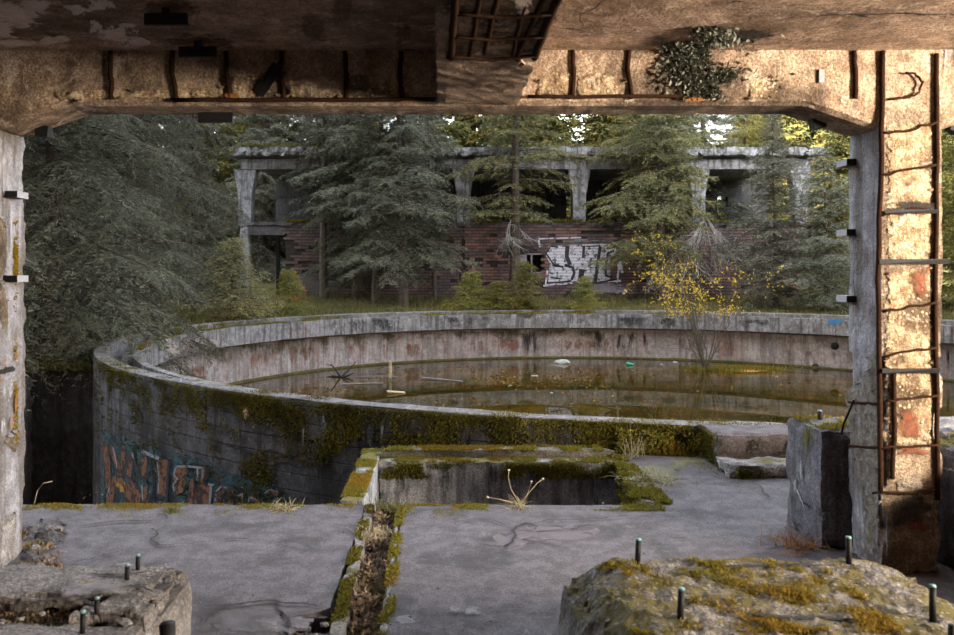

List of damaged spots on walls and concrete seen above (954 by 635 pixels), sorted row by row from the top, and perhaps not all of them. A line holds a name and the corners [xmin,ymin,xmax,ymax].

peeling [0,0,70,48]
peeling [63,0,151,49]
spalling [439,0,567,69]
spalling [0,216,12,330]
rust [912,264,930,297]
leakage [448,317,565,353]
leakage [580,330,604,348]
leakage [617,317,646,350]
rust [899,410,929,455]
crack [476,515,650,551]